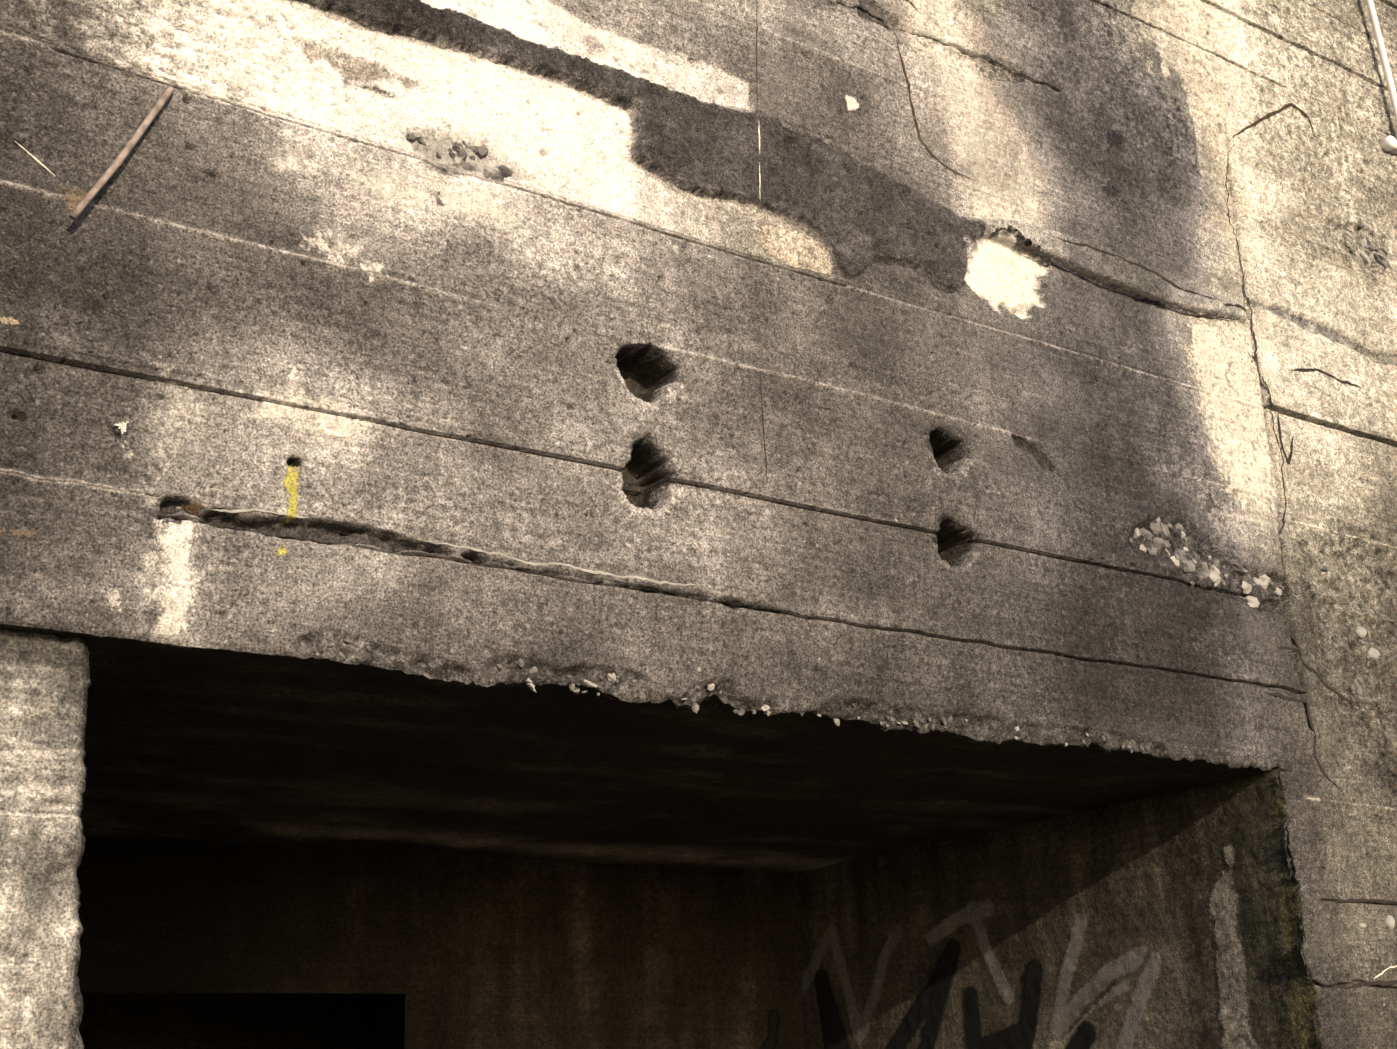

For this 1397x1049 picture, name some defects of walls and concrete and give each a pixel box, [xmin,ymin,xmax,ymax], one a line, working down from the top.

spalling [0,0,1045,317]
crack [755,126,763,193]
crack [895,0,981,182]
crack [1224,103,1362,584]
spalling [295,626,650,699]
spalling [676,680,778,716]
spalling [804,698,1166,758]
crack [1261,626,1354,790]